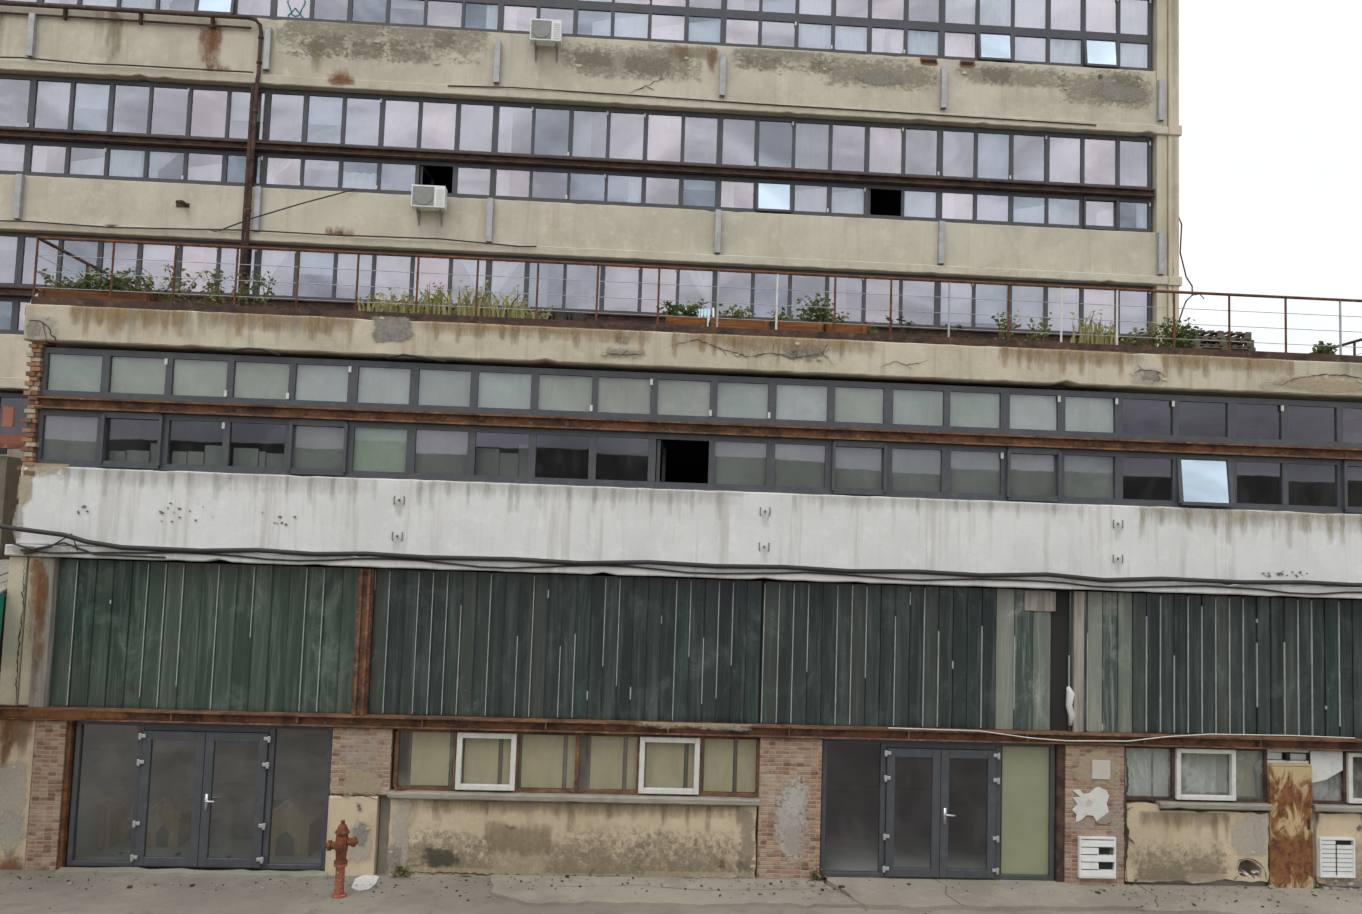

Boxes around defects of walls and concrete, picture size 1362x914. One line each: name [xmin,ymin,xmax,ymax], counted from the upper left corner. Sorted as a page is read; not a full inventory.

corrosion [200,21,226,72]
corrosion [329,71,353,85]
damp [73,306,353,337]
damp [426,321,644,338]
crack [608,339,831,362]
crack [1280,372,1361,386]
corrosion [29,559,47,670]
peeling [1073,787,1113,825]